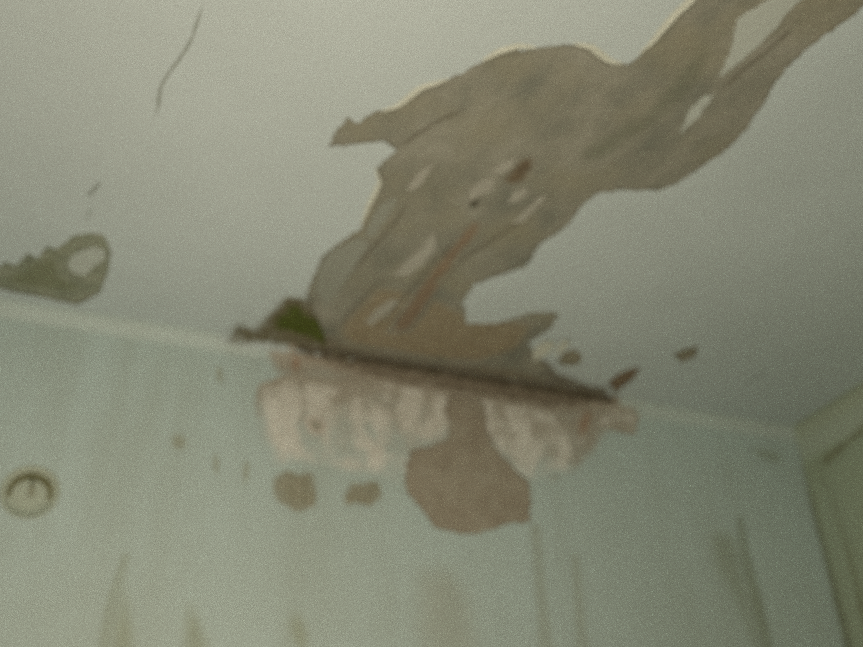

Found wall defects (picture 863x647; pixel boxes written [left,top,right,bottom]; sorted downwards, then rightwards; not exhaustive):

crack [151,0,207,123]
peeling [306,0,863,375]
peeling [0,233,111,304]
damp [221,290,640,490]
spalling [606,368,640,394]